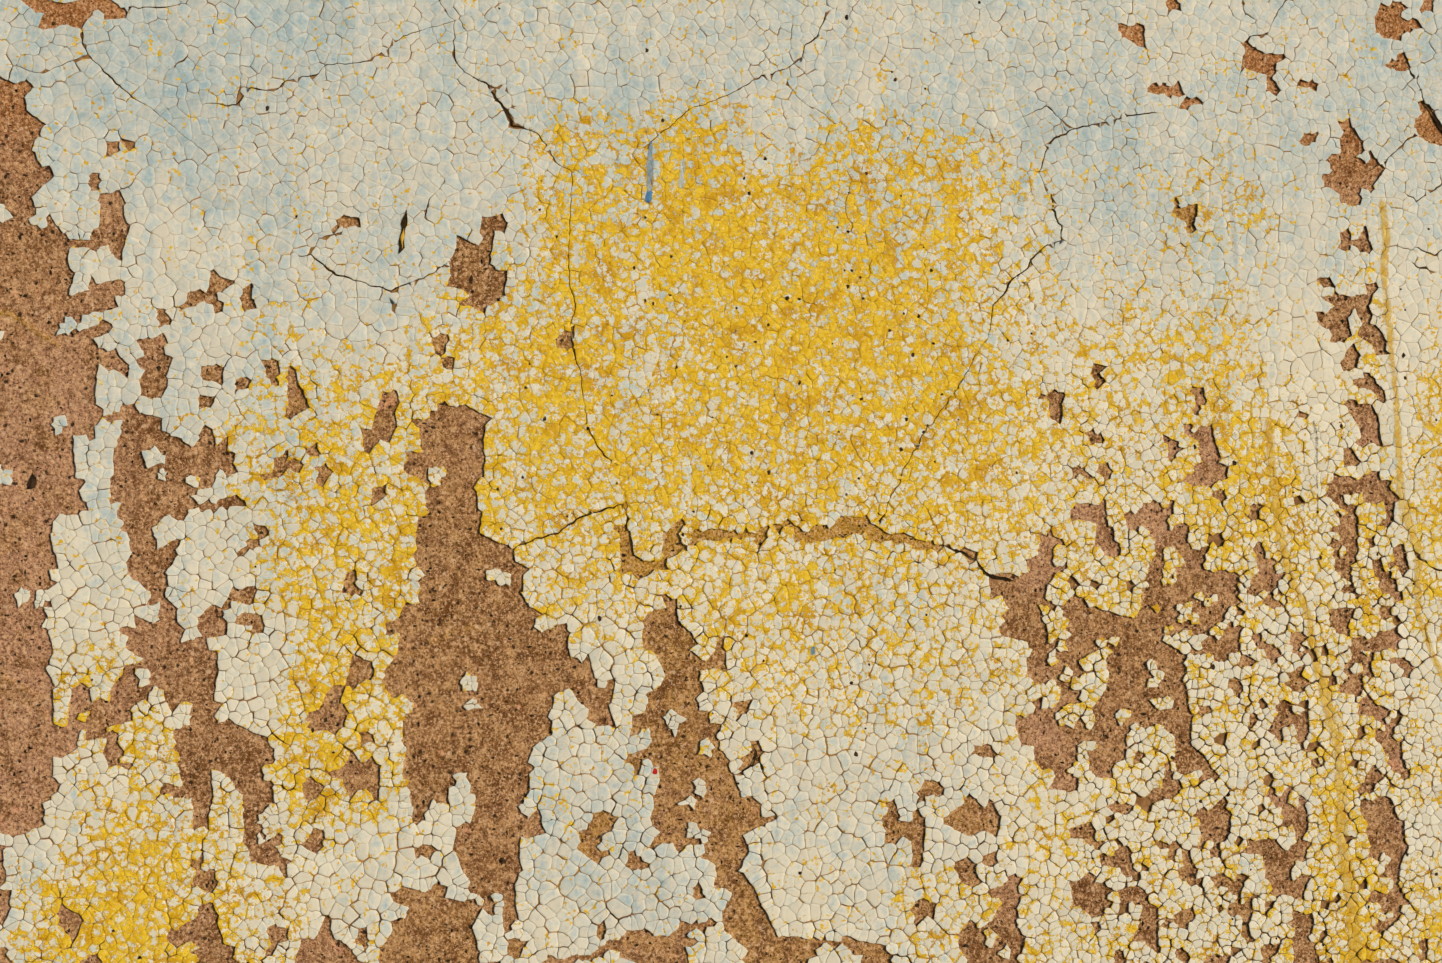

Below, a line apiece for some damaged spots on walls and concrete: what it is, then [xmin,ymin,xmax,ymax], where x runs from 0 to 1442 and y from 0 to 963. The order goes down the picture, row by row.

crack [207,0,616,464]
peeling [443,200,521,315]
crack [645,0,835,147]
crack [880,106,1150,519]
peeling [1299,119,1393,255]
peeling [1371,0,1434,80]
crack [1363,69,1442,174]
peeling [0,74,329,963]
crack [514,504,628,548]
peeling [166,380,1337,963]
crack [941,545,1016,582]
peeling [1312,268,1437,963]